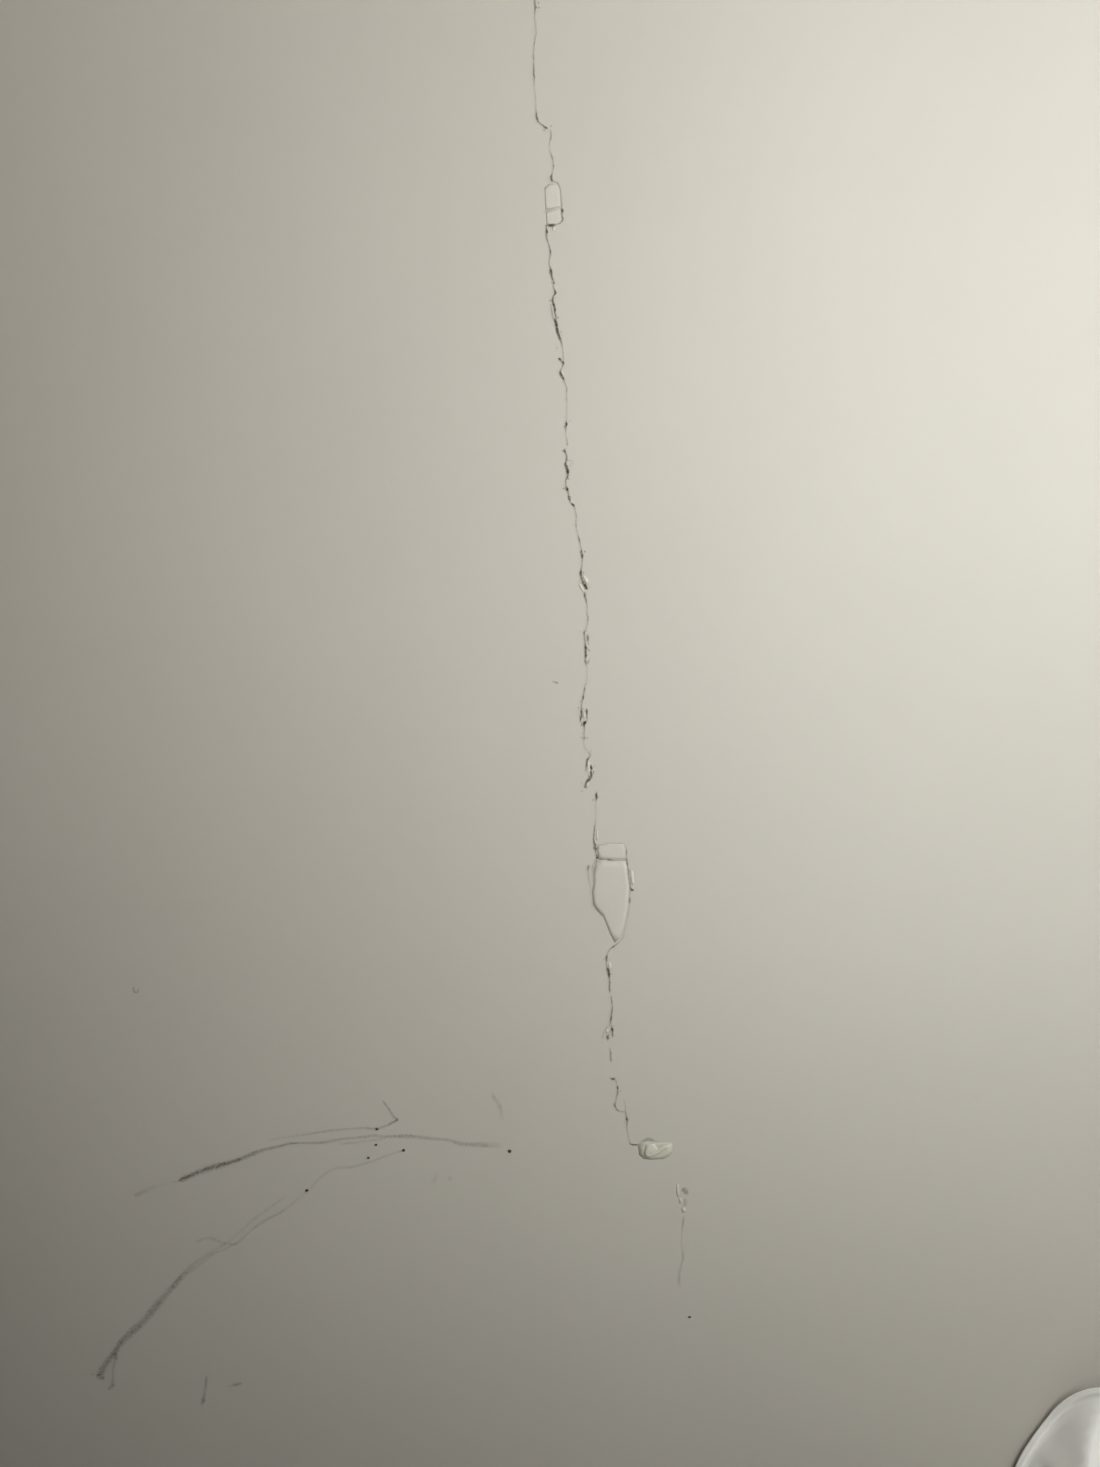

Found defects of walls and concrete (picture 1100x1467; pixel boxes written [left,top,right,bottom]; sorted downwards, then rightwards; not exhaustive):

crack [545,175,564,383]
crack [562,420,634,901]
crack [605,956,613,1039]